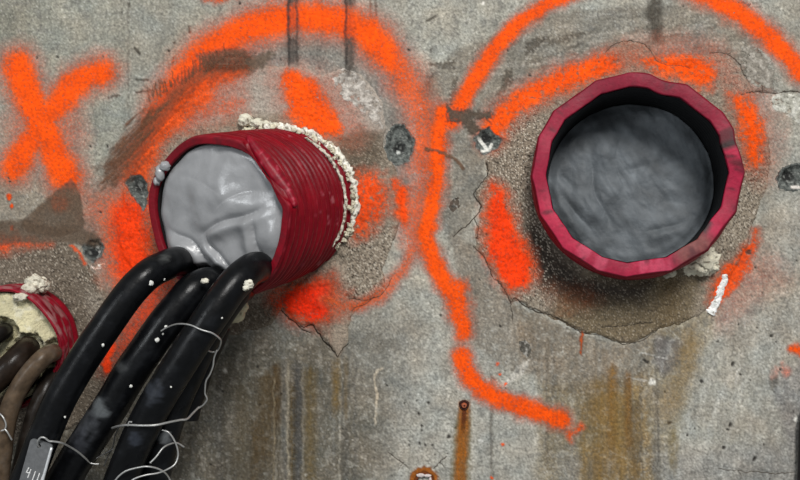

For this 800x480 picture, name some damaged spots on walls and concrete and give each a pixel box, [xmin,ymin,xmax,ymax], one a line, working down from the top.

damp [287,0,297,63]
crack [711,52,798,95]
corrosion [410,466,438,480]
corrosion [454,405,470,480]